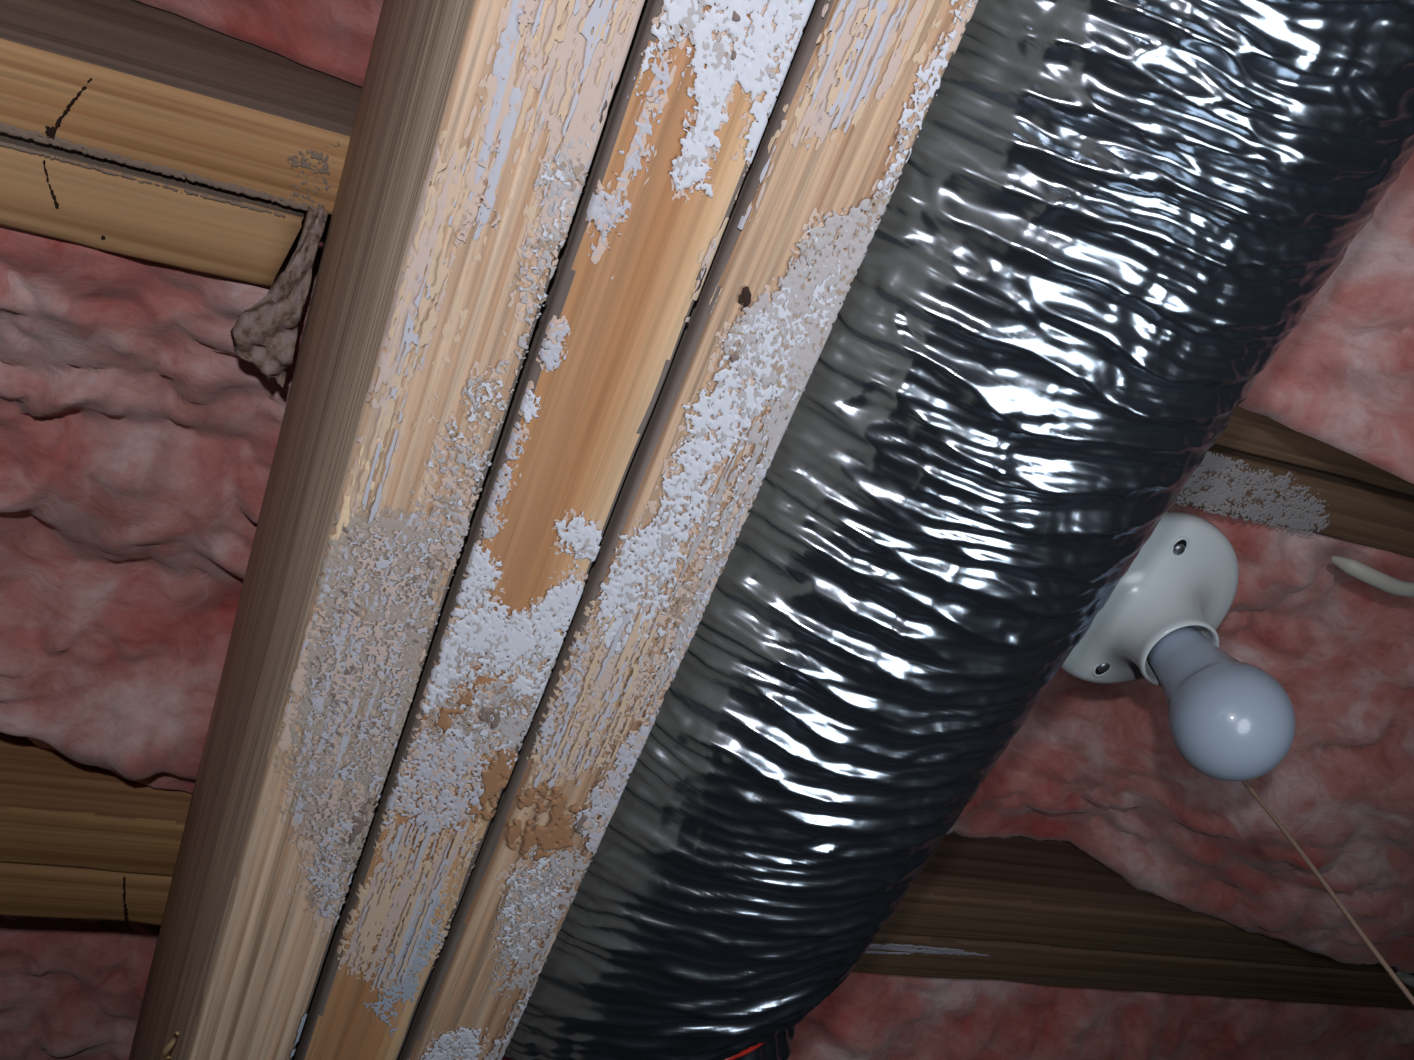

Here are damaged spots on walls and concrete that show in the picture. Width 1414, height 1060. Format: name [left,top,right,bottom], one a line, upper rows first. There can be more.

leakage [263,0,990,1060]